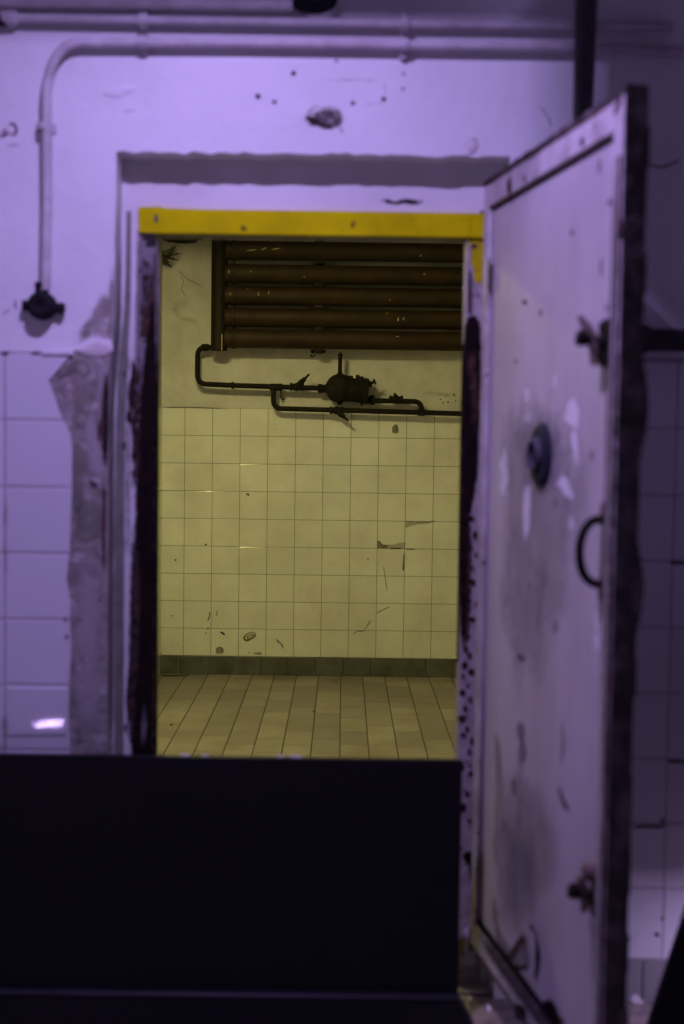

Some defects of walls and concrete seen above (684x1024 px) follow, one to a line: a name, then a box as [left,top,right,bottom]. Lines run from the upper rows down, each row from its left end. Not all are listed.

peeling [32,341,113,754]
rust [123,238,160,755]
rust [457,271,484,788]
rust [461,792,482,888]